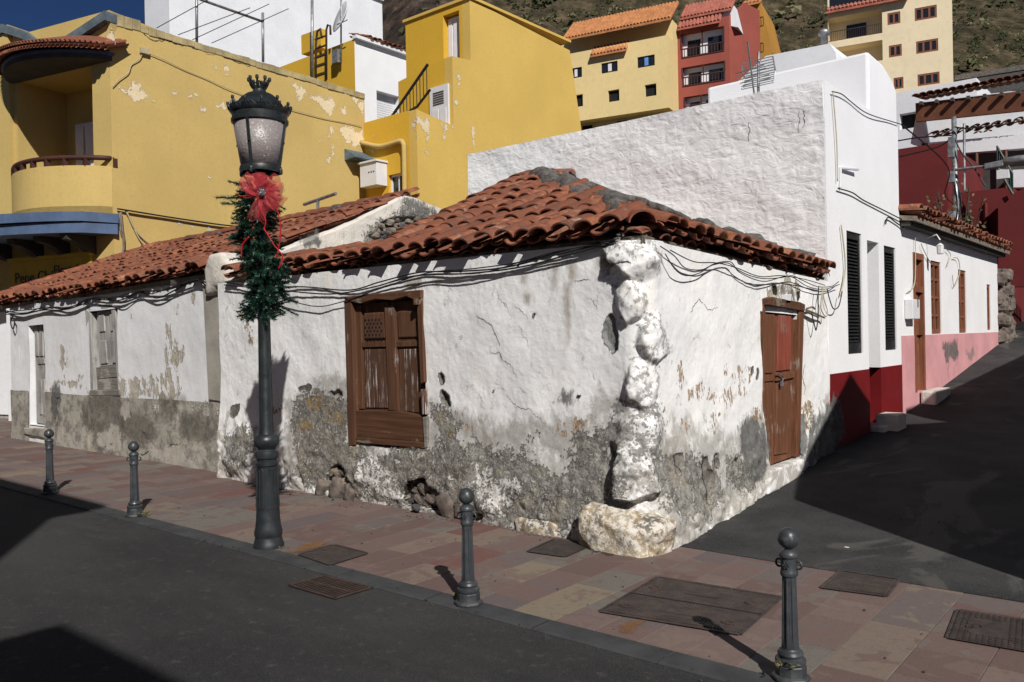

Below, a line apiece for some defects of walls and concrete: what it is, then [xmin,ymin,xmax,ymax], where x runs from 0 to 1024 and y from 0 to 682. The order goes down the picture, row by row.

peeling [118,81,156,103]
peeling [291,82,375,165]
peeling [412,115,454,155]
peeling [50,344,90,399]
peeling [118,303,185,400]
crack [477,297,542,422]
peeling [671,360,759,434]
damp [943,340,974,362]
flaking render [273,373,631,539]
flaking render [640,417,756,525]